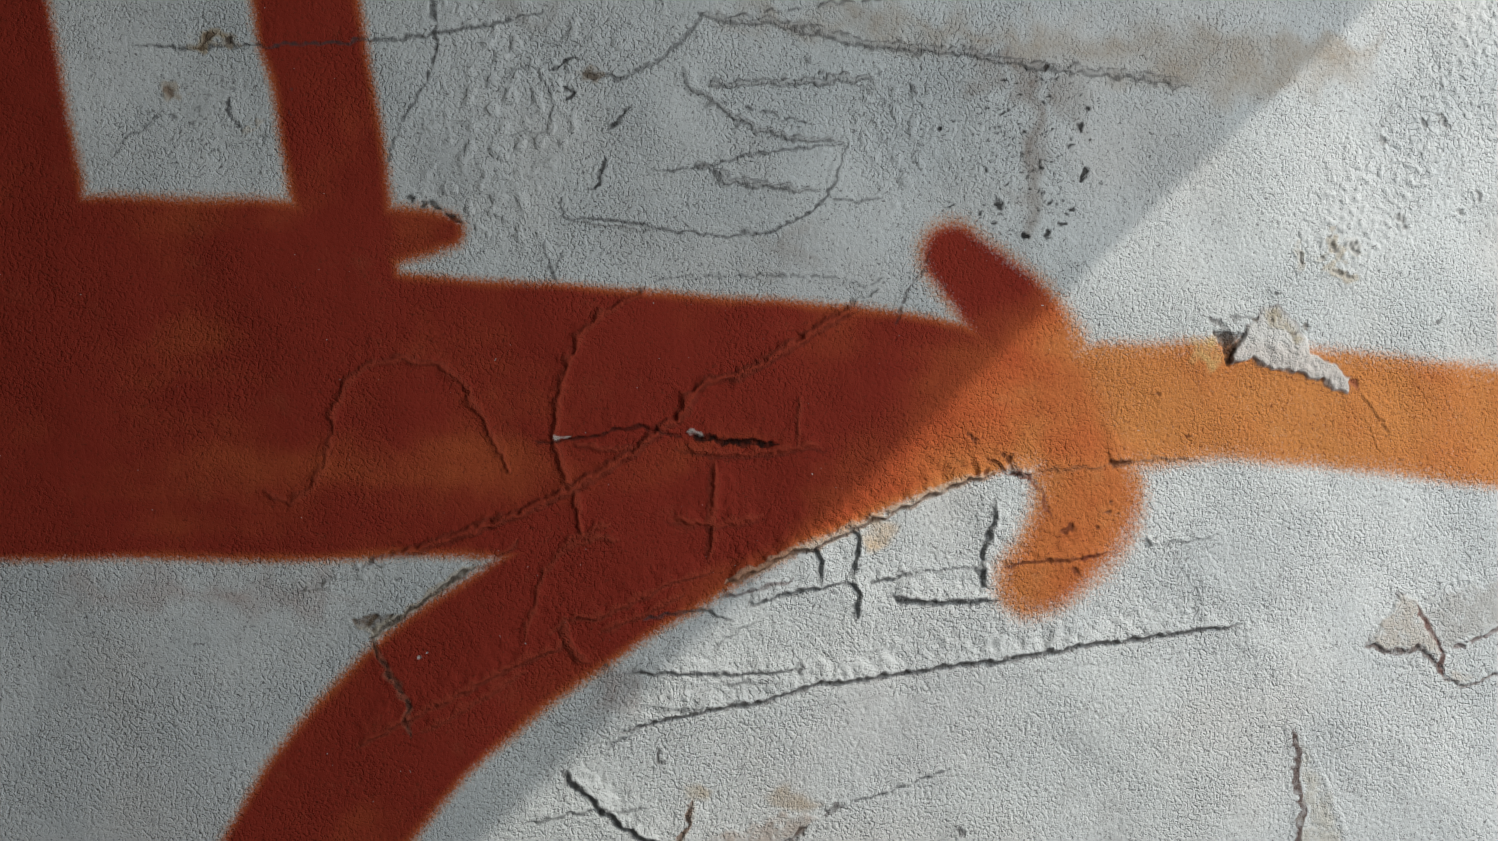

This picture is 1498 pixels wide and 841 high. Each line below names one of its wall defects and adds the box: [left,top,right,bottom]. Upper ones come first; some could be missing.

crack [103,104,171,165]
crack [118,0,471,232]
crack [535,0,1196,292]
crack [665,390,838,471]
spalling [1193,228,1408,457]
crack [508,442,1258,841]
peeling [1353,568,1498,700]